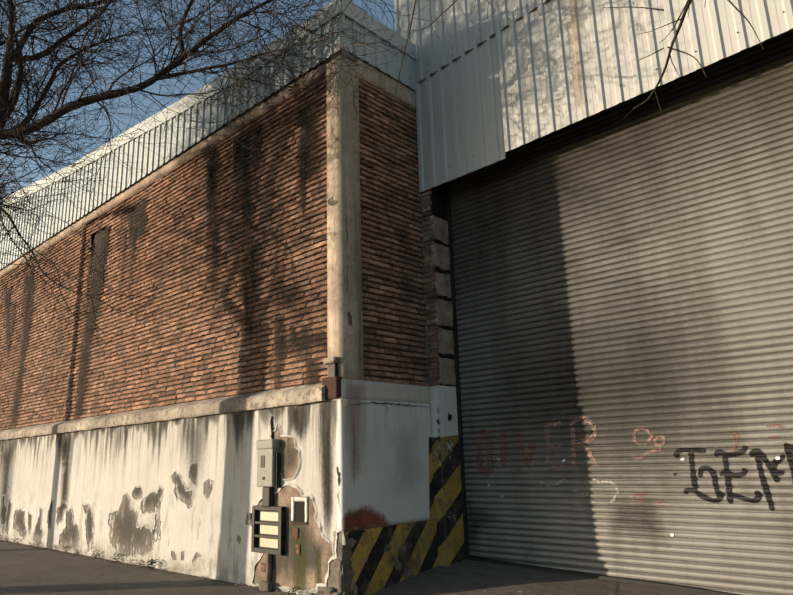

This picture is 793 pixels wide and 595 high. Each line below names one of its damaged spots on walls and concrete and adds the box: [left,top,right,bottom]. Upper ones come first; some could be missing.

damp [205,140,219,291]
damp [234,123,262,339]
damp [3,269,34,425]
damp [73,227,109,420]
damp [274,316,327,390]
peeling [1,494,95,553]
damp [0,403,310,532]
peeling [107,462,213,558]
peeling [171,550,202,566]
flaking render [252,422,358,595]
damp [320,399,347,524]
rust [345,509,388,530]